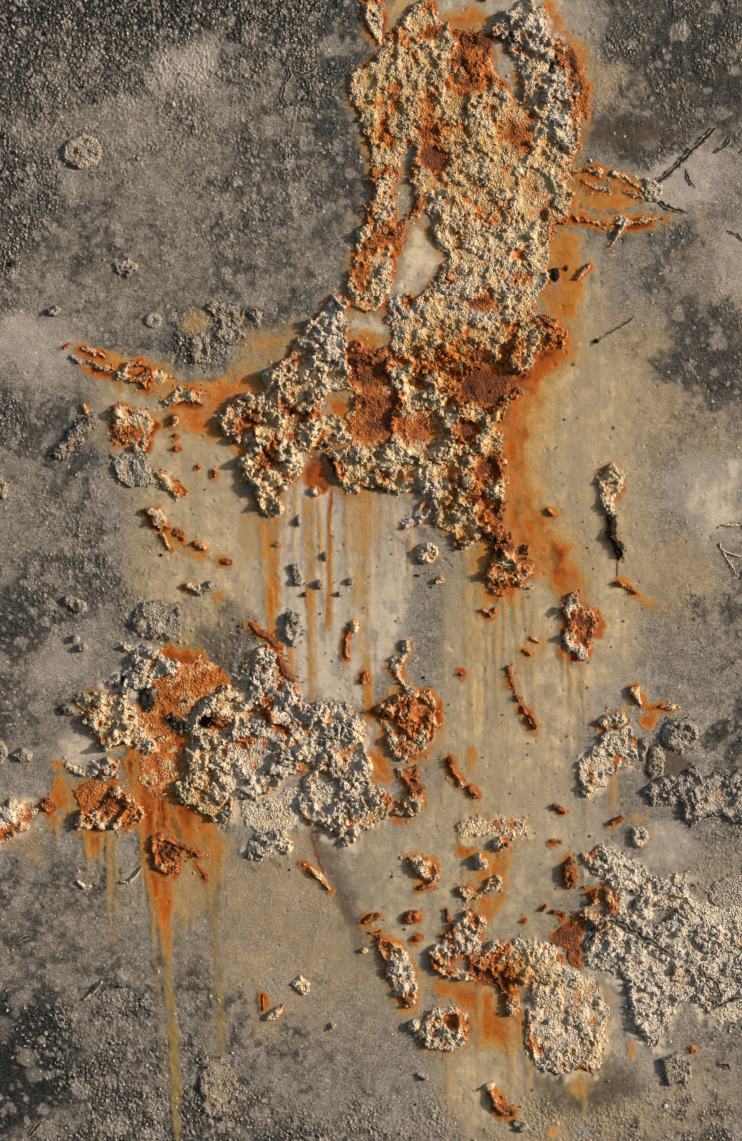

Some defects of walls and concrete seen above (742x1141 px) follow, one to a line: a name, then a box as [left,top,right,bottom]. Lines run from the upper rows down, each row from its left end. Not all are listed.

corrosion [105,330,298,458]
leakage [185,295,272,373]
corrosion [478,162,669,602]
leakage [681,456,742,546]
corrosion [464,542,551,736]
leakage [639,737,742,827]
corrosion [124,698,231,1138]
leakage [197,1055,244,1123]
corrosion [359,912,532,1083]
leakage [399,1003,522,1138]
crack [583,914,742,1010]
leakage [706,999,742,1029]